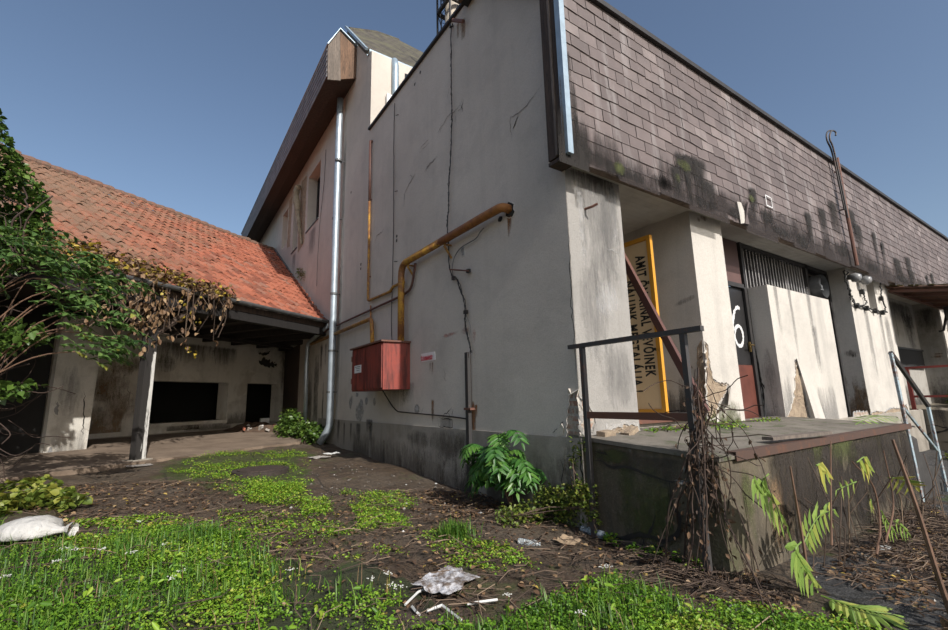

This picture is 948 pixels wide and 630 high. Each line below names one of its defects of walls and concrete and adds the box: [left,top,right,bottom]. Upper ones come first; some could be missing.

damp [558,117,590,172]
rust [437,203,512,246]
damp [607,154,929,286]
damp [337,420,467,491]
spalling [555,388,597,437]
spalling [608,419,640,433]
flaking render [696,339,731,421]
flaking render [787,359,825,419]